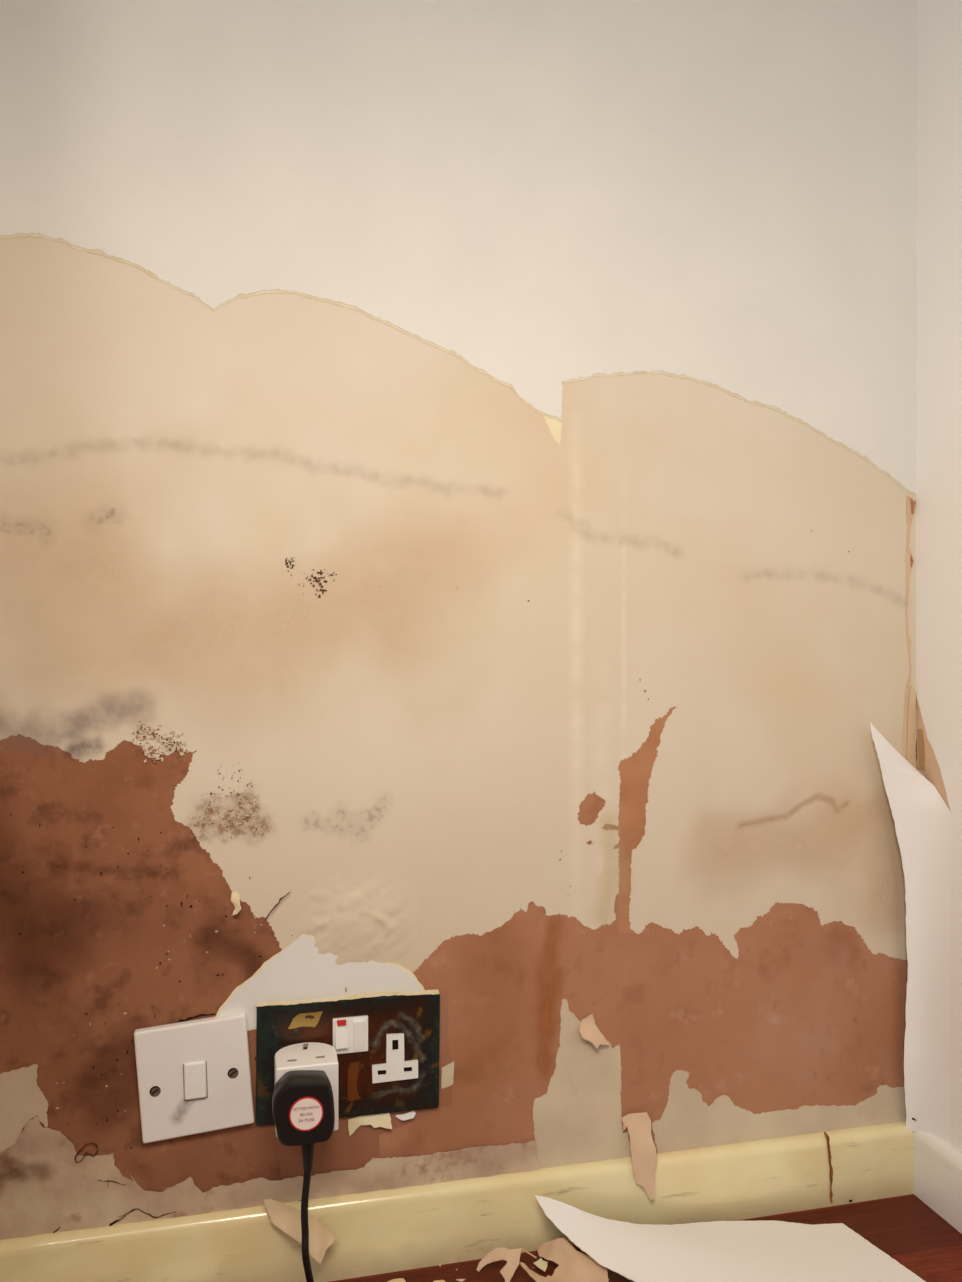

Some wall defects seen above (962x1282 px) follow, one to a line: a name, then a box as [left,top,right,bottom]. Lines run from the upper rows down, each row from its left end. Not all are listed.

damp [197,798,267,834]
flaking render [0,685,953,1264]
crack [824,1132,833,1203]